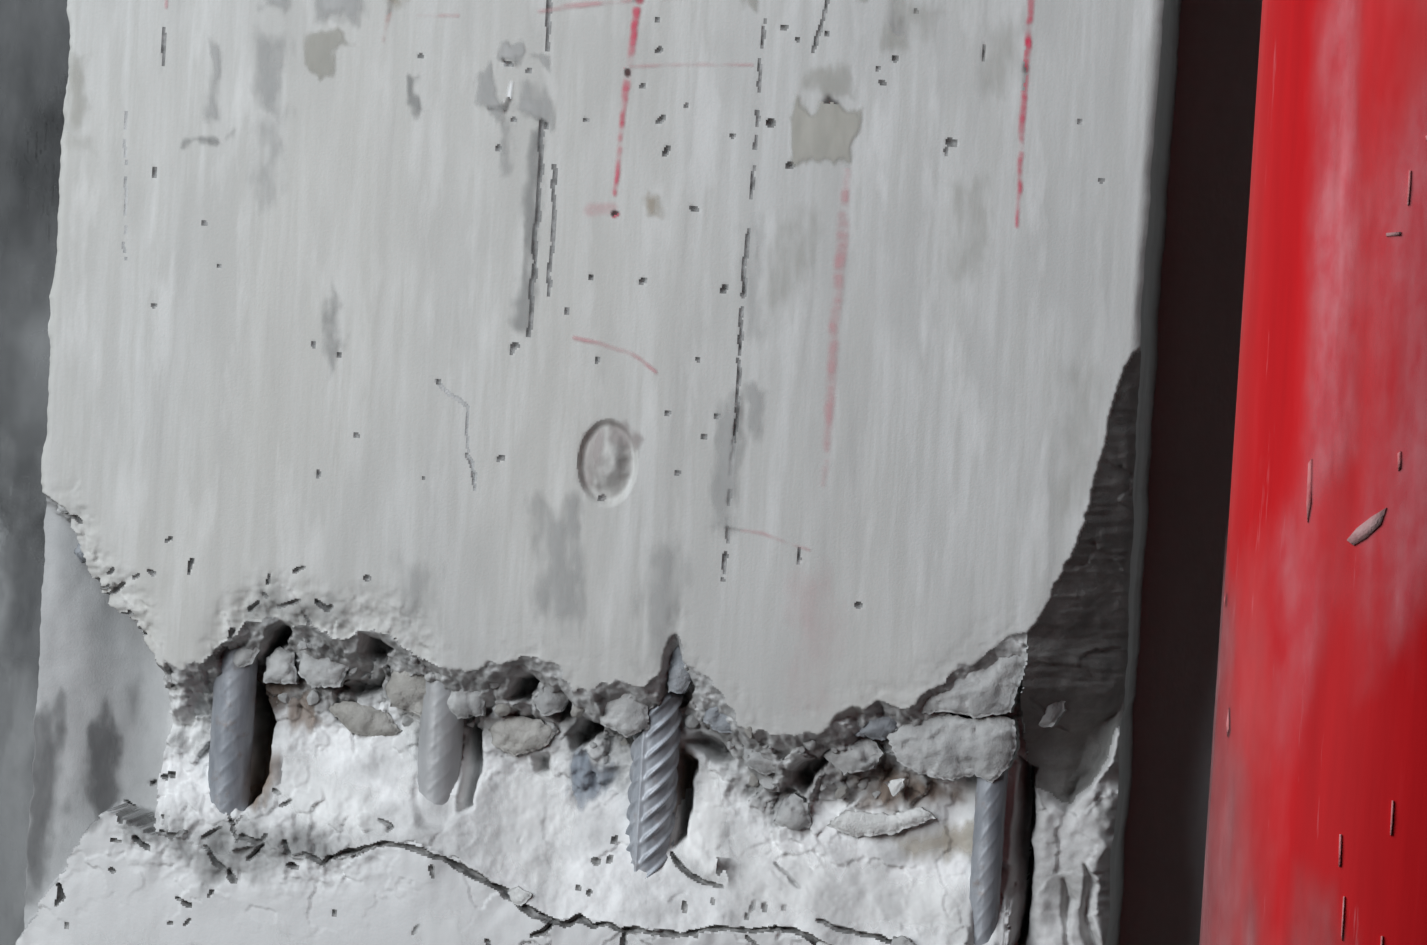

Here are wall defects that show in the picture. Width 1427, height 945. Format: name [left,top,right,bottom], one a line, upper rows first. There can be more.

spalling [16,351,1141,945]
crack [325,840,892,945]